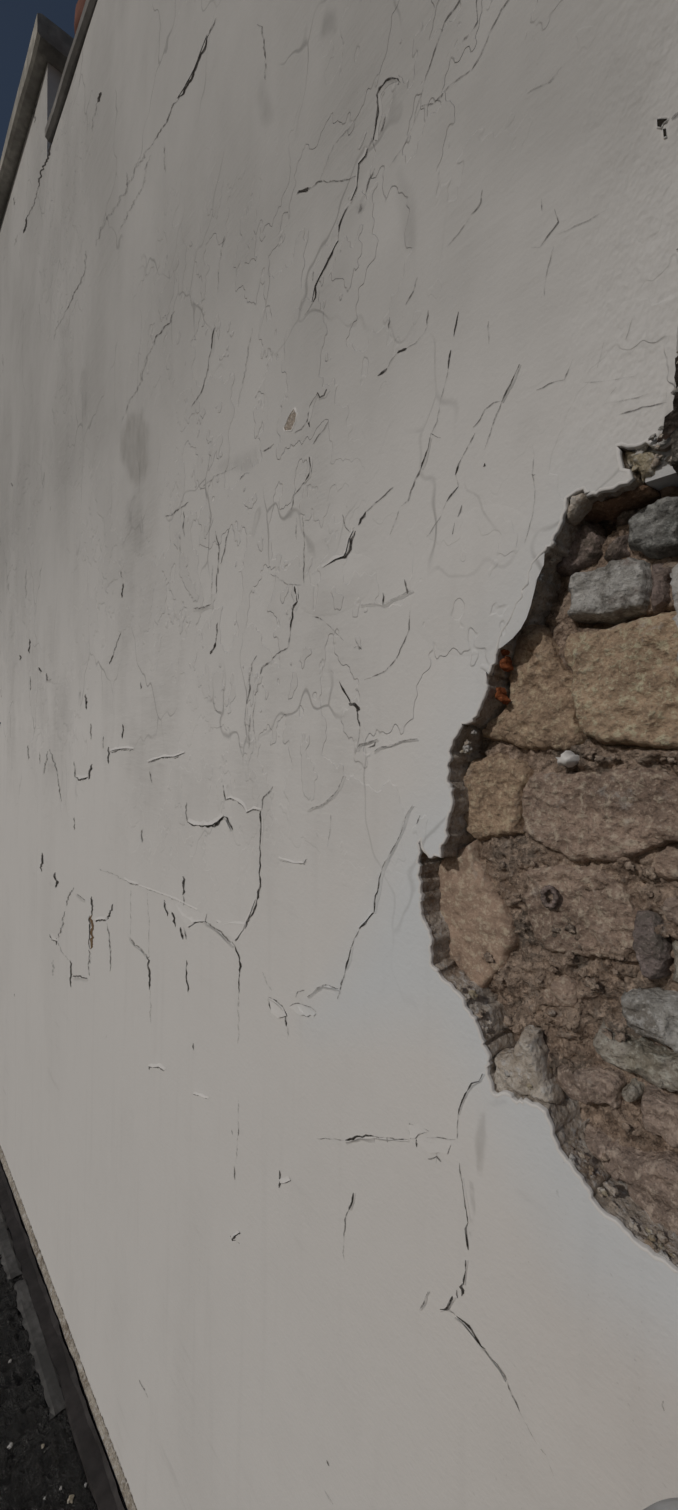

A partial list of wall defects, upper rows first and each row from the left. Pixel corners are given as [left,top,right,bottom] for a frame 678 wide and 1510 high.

crack [157,24,214,137]
crack [297,0,507,301]
flaking render [656,117,669,139]
crack [377,292,459,376]
crack [622,351,678,450]
crack [246,364,552,704]
crack [339,621,410,726]
crack [40,854,189,991]
crack [223,785,273,991]
crack [337,806,420,999]
flaking render [416,438,678,1273]
crack [420,1074,520,1412]